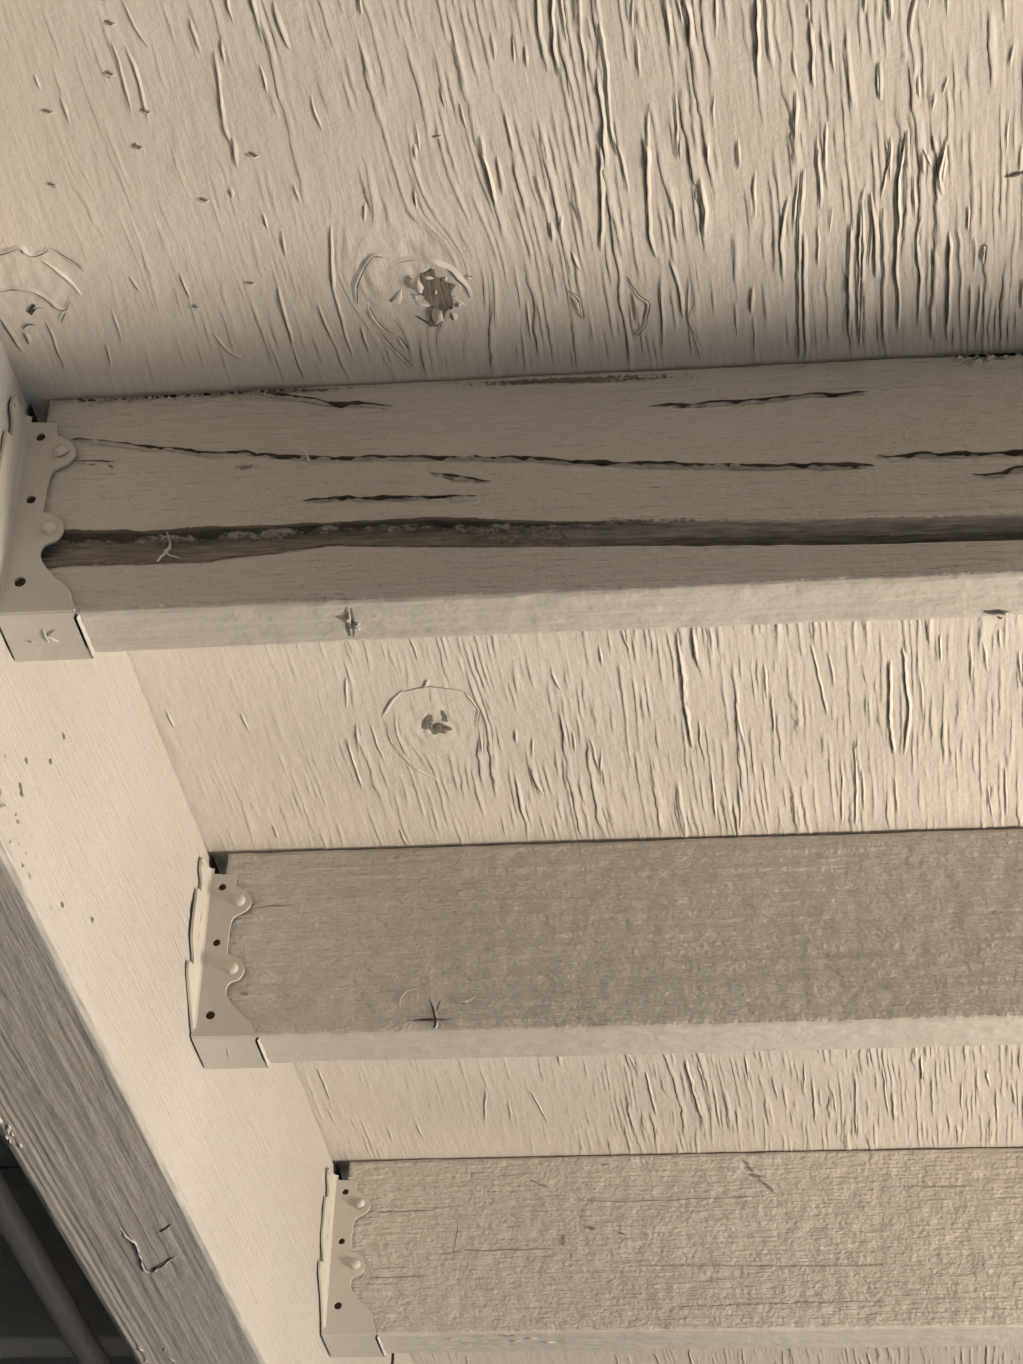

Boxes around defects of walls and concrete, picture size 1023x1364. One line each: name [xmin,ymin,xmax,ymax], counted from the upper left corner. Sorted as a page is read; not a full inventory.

crack [0,290,70,369]
hole [423,710,453,735]
crack [219,606,1023,846]
crack [318,1045,1023,1156]
crack [580,1195,750,1203]
crack [882,1183,960,1191]
crack [782,1347,1020,1364]